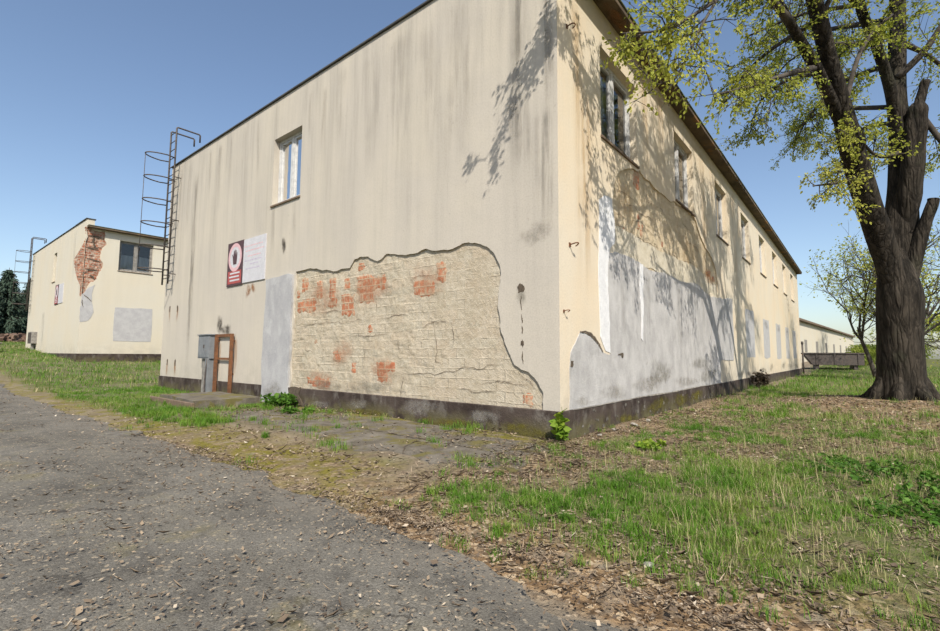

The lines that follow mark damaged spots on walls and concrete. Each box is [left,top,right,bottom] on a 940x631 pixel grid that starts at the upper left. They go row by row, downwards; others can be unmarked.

spalling [74,227,106,296]
spalling [613,169,717,298]
spalling [291,243,543,410]